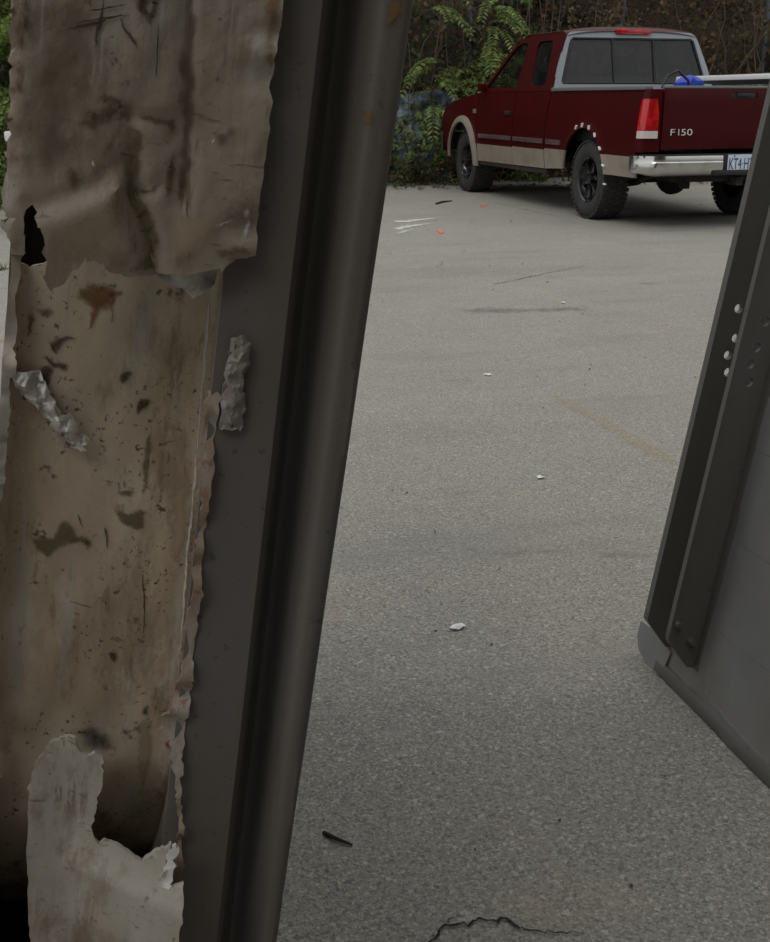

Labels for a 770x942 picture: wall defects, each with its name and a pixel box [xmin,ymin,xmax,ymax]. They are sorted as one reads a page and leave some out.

leakage [72,1,136,45]
rust [80,285,122,328]
peeling [219,335,251,431]
peeling [13,370,90,452]
peeling [159,843,179,890]
crack [428,915,584,942]